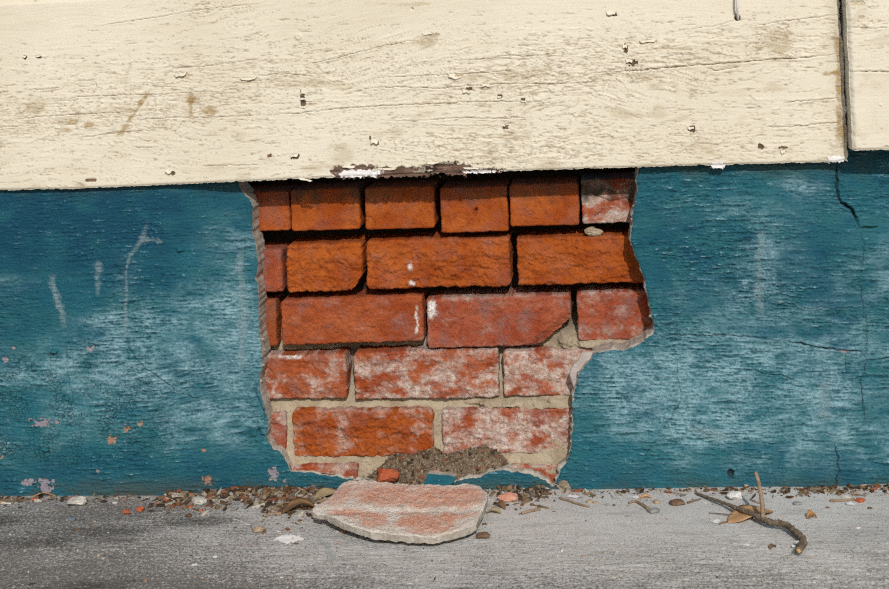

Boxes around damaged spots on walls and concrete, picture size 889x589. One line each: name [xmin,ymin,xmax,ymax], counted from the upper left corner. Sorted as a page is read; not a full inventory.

spalling [239,181,376,483]
peeling [330,161,503,179]
spalling [452,167,654,487]
crack [665,167,889,484]